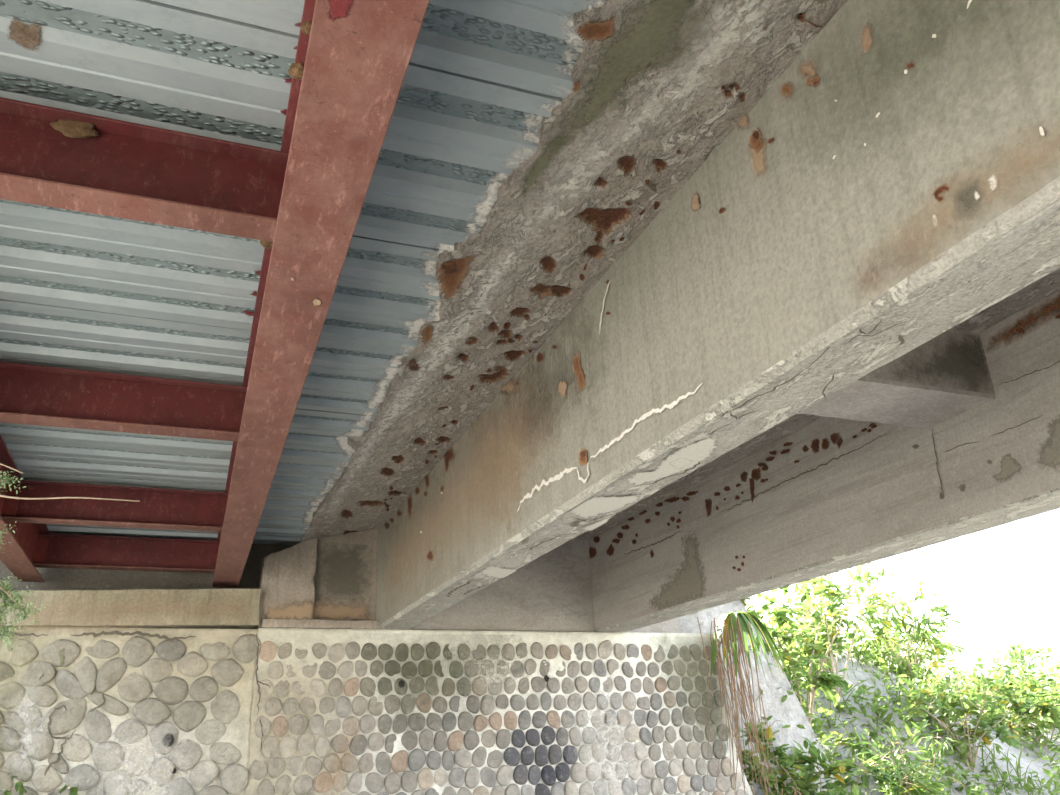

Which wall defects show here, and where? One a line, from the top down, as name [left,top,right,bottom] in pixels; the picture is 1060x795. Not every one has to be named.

peeling [328,0,353,21]
rust [437,256,473,299]
rust [421,326,434,347]
rust [988,295,1060,349]
rust [572,352,586,392]
crack [998,361,1060,386]
rust [442,447,454,471]
rust [578,448,587,466]
crack [517,383,702,512]
crack [932,414,1044,494]
rust [385,475,429,529]
peeling [568,423,877,559]